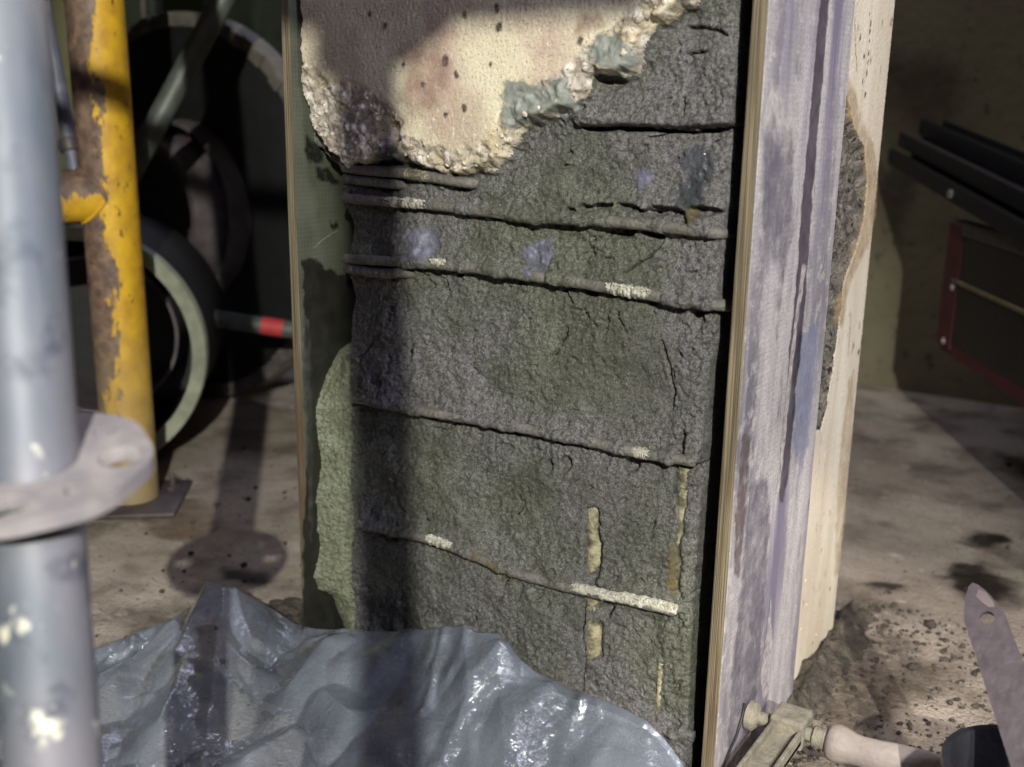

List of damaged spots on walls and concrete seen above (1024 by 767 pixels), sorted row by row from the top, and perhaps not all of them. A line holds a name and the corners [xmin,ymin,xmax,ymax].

damp [382,196,426,209]
spalling [816,96,867,430]
damp [605,282,651,300]
spalling [301,0,753,767]
crack [664,344,677,400]
damp [425,534,453,549]
damp [569,583,679,615]